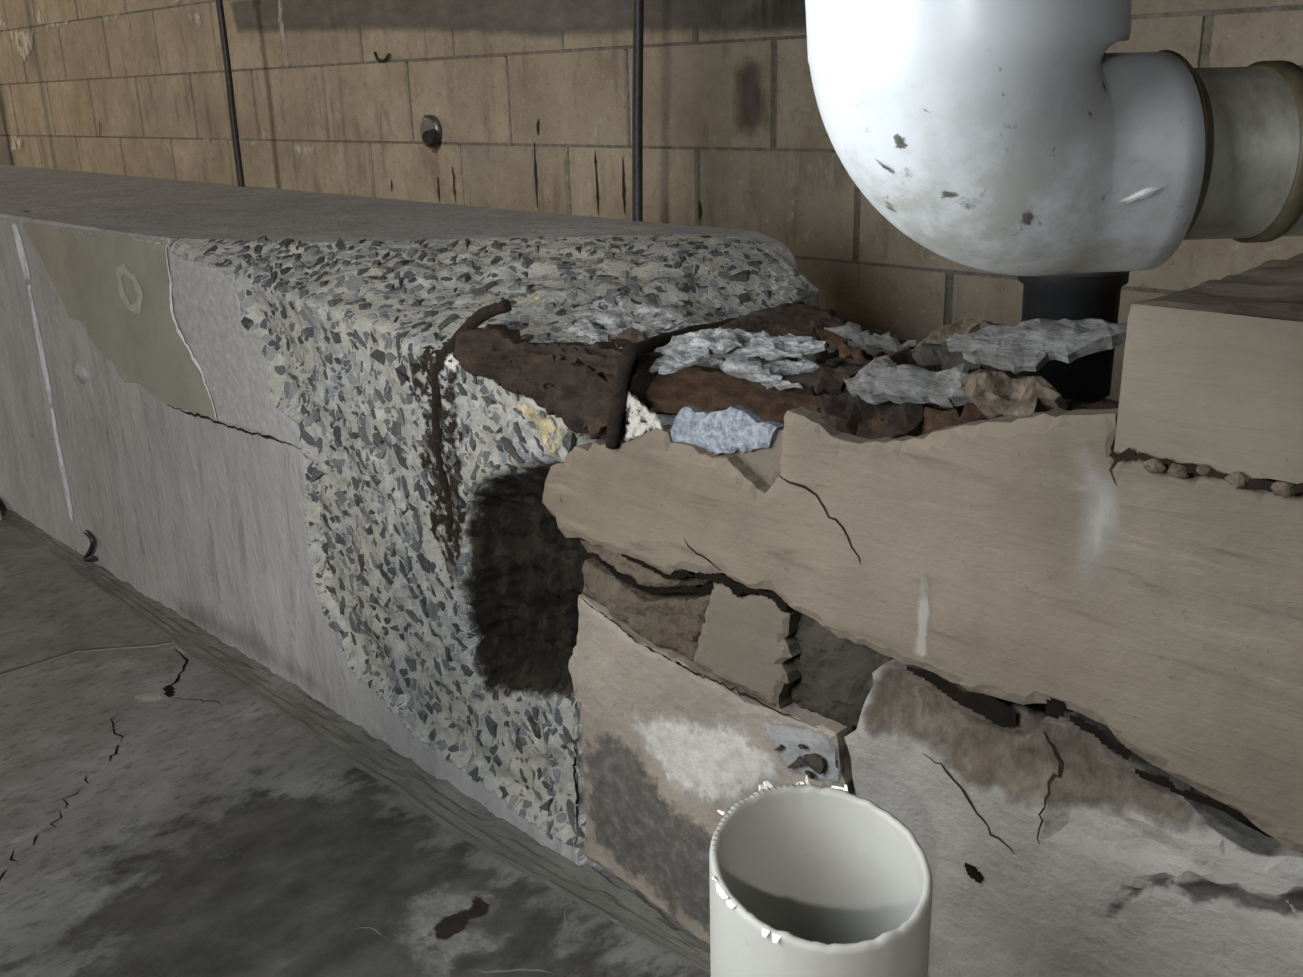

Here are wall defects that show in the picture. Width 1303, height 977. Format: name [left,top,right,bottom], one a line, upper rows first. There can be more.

crack [166,405,300,449]
peeling [22,210,1303,852]
crack [588,539,794,613]
corrosion [410,324,989,590]
crack [777,475,860,563]
crack [0,711,124,880]
crack [159,649,221,705]
leakage [58,768,707,977]
leakage [586,714,777,930]
crack [907,666,1273,854]